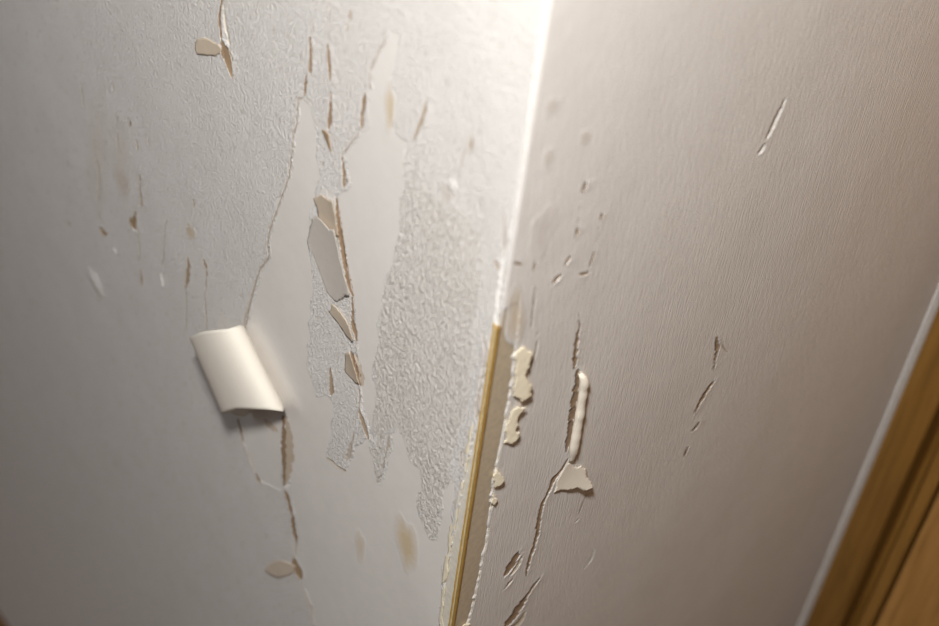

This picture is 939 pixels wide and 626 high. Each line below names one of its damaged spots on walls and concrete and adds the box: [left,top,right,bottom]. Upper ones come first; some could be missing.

crack [195,0,233,78]
crack [237,415,314,626]
peeling [237,31,496,626]
peeling [463,337,533,626]
peeling [526,316,593,576]
crack [684,337,728,457]